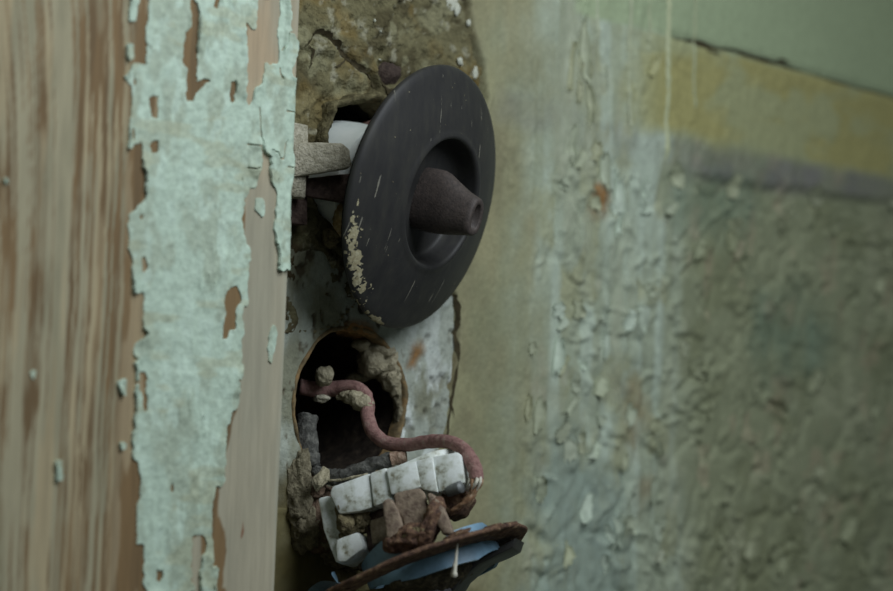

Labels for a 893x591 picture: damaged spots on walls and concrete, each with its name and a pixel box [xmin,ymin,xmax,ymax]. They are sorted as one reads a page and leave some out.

peeling [556,14,627,238]
peeling [725,174,743,198]
peeling [117,0,482,591]
peeling [552,299,609,465]
peeling [622,282,658,333]
peeling [579,491,594,524]